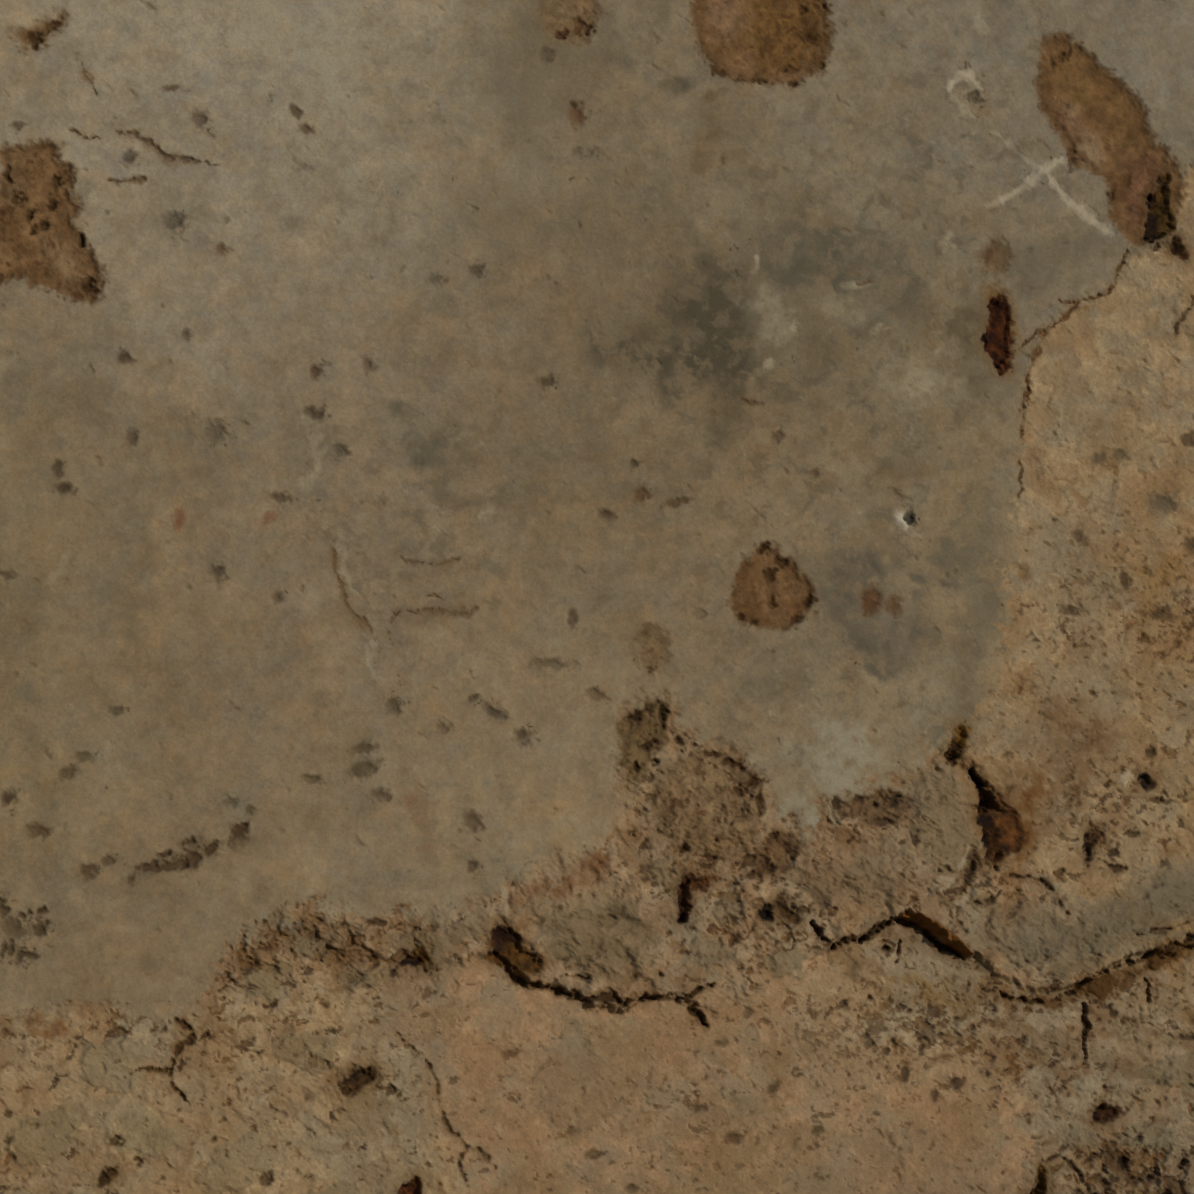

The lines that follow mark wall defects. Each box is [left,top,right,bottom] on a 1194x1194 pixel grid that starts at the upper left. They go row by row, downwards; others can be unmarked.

spalling [537,0,604,67]
spalling [689,0,837,92]
spalling [0,122,108,305]
crack [1017,253,1129,499]
spalling [50,458,80,498]
spalling [954,32,1194,905]
spalling [725,541,822,633]
spalling [858,583,906,621]
spalling [0,687,1194,1194]
crack [809,892,978,966]
crack [502,969,717,1028]
crack [999,921,1194,1068]